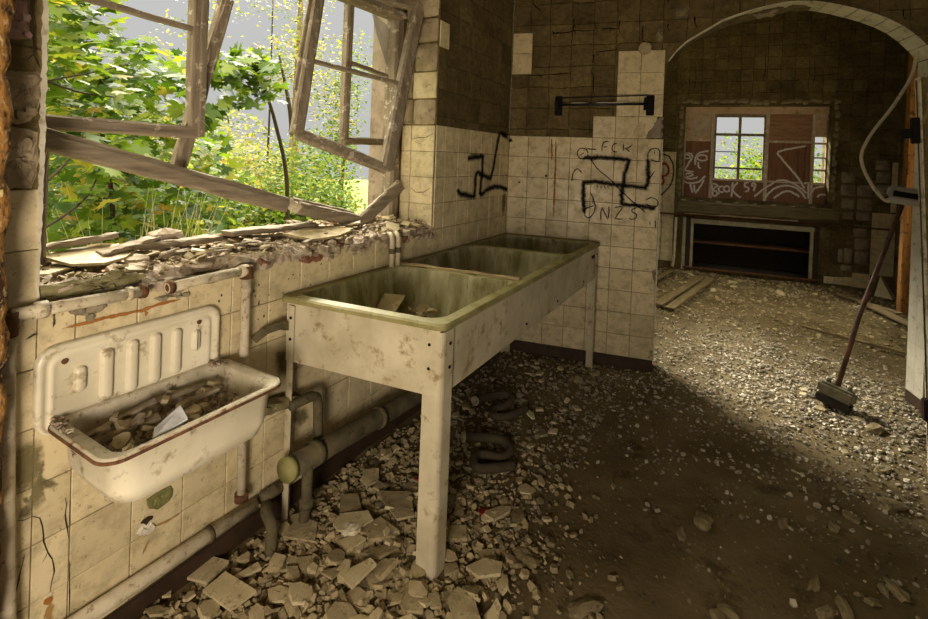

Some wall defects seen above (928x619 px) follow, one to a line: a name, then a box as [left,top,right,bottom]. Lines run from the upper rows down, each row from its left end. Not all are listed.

spalling [646,117,664,138]
spalling [255,229,434,266]
flaking render [39,269,146,302]
flaking render [153,289,190,302]
flaking render [69,304,108,322]
corrosion [66,299,180,328]
crack [63,498,71,538]
crack [16,516,70,618]